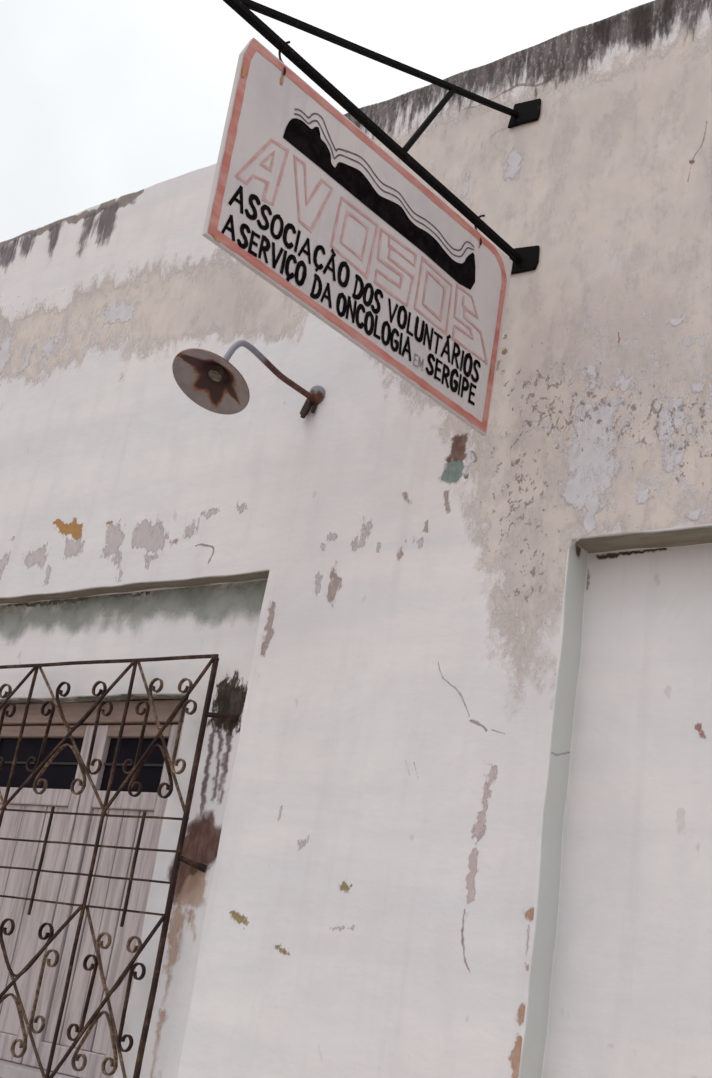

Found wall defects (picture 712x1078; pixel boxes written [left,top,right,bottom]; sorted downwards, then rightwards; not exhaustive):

leakage [343,0,712,139]
peeling [0,249,307,386]
peeling [371,25,712,697]
peeling [103,508,217,581]
peeling [351,518,381,552]
leakage [574,527,712,559]
peeling [315,569,341,602]
crack [438,661,505,734]
corrosion [167,671,248,983]
peeling [461,765,497,971]
flaking render [525,908,534,948]
flaking render [509,1004,525,1078]